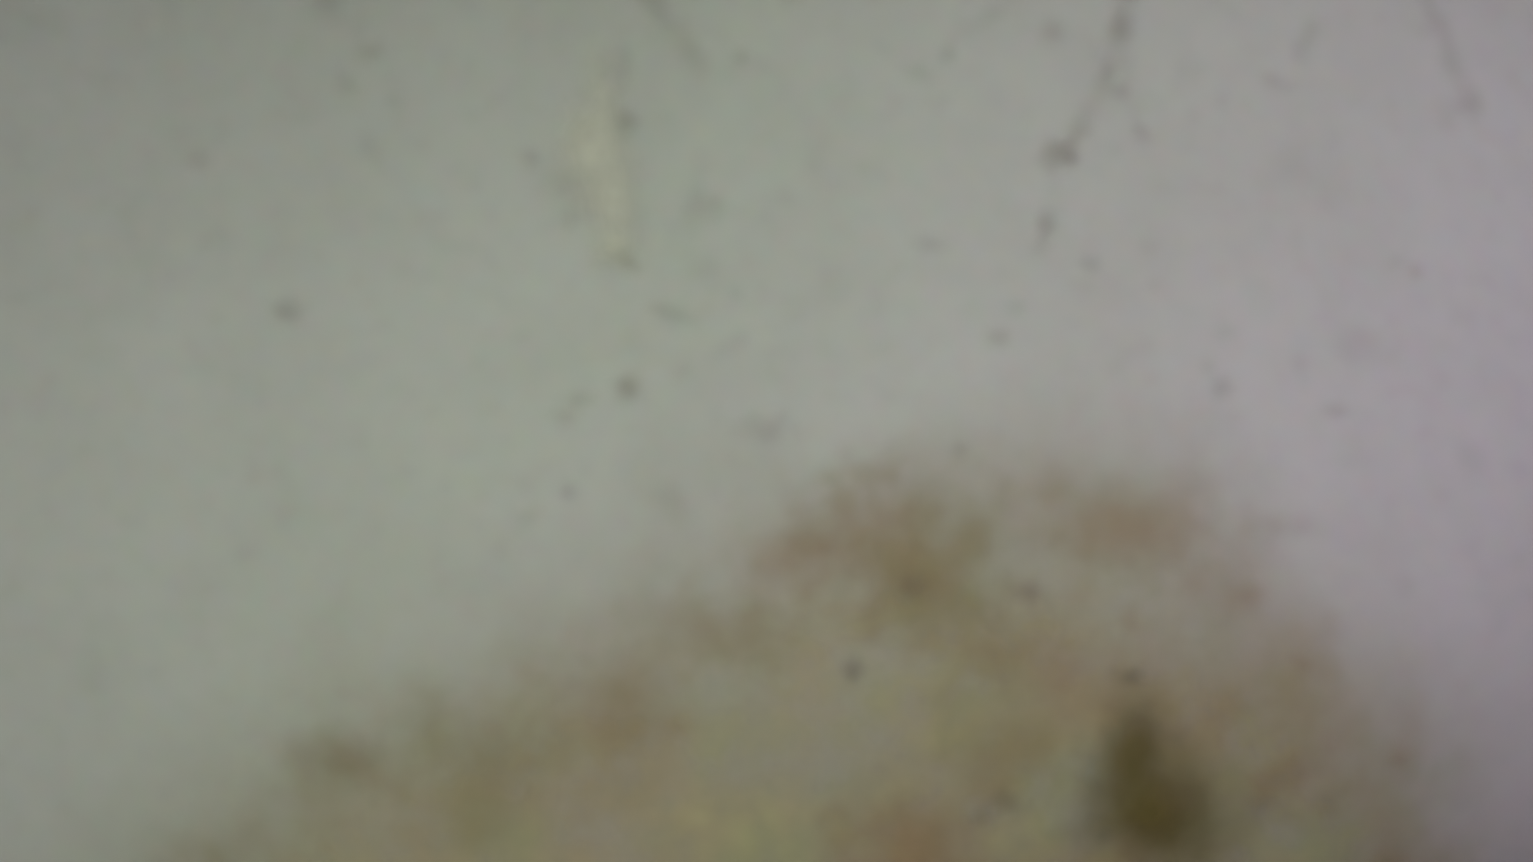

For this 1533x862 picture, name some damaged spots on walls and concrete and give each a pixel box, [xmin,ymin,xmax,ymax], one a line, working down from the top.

leakage [288,590,1377,862]